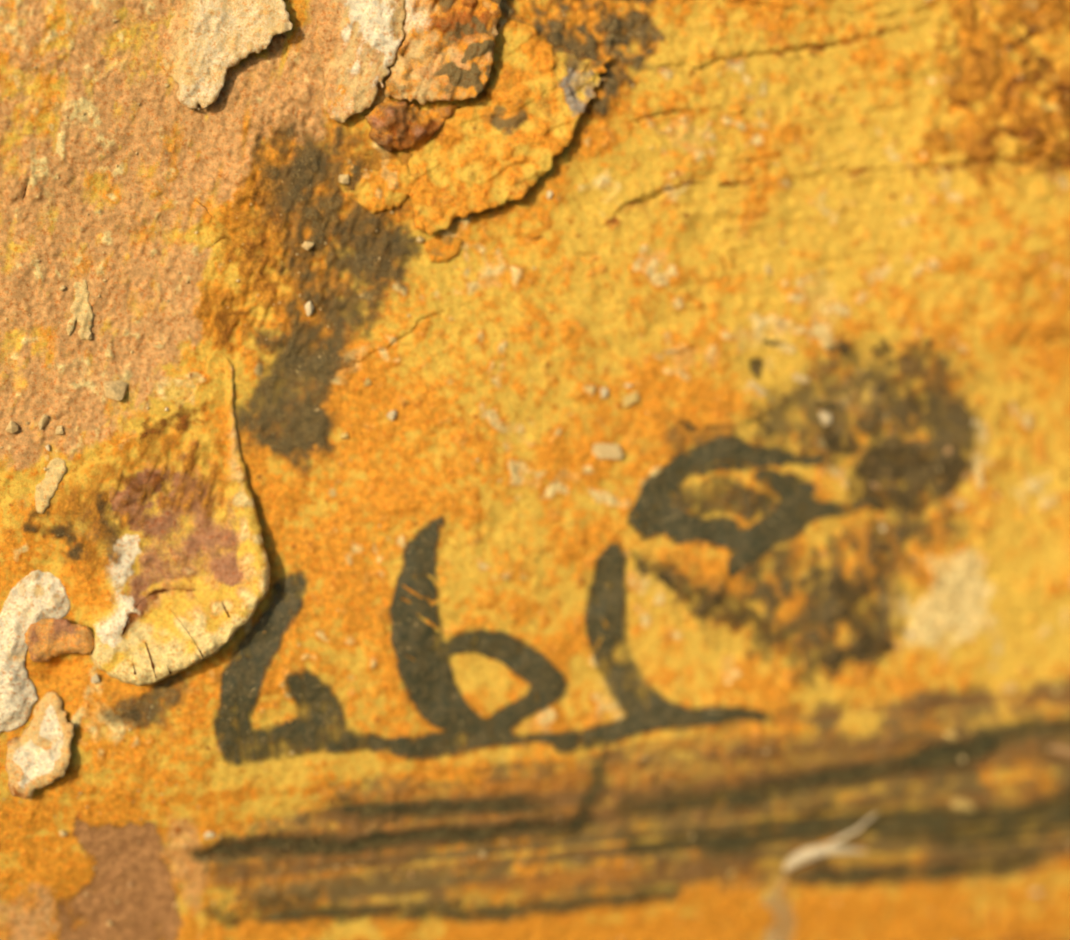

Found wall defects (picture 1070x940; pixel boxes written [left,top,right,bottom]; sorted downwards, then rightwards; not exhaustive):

peeling [159,0,293,110]
crack [658,12,899,77]
peeling [315,0,614,263]
crack [629,110,690,123]
crack [604,154,785,227]
crack [836,153,1067,172]
damp [238,127,416,469]
damp [640,340,974,682]
peeling [0,351,270,799]
damp [195,752,609,858]
damp [619,717,1070,814]
damp [205,887,681,926]